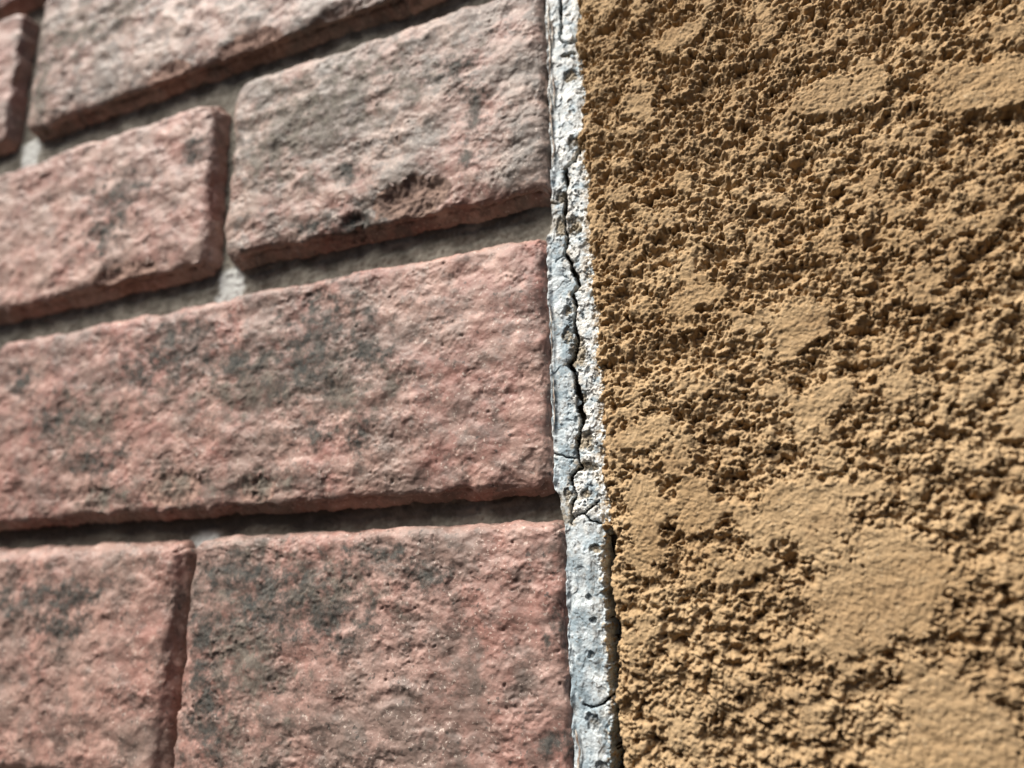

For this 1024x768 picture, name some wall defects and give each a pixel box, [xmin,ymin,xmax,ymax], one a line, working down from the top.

crack [551,151,618,557]
crack [586,616,622,708]
crack [615,736,626,768]